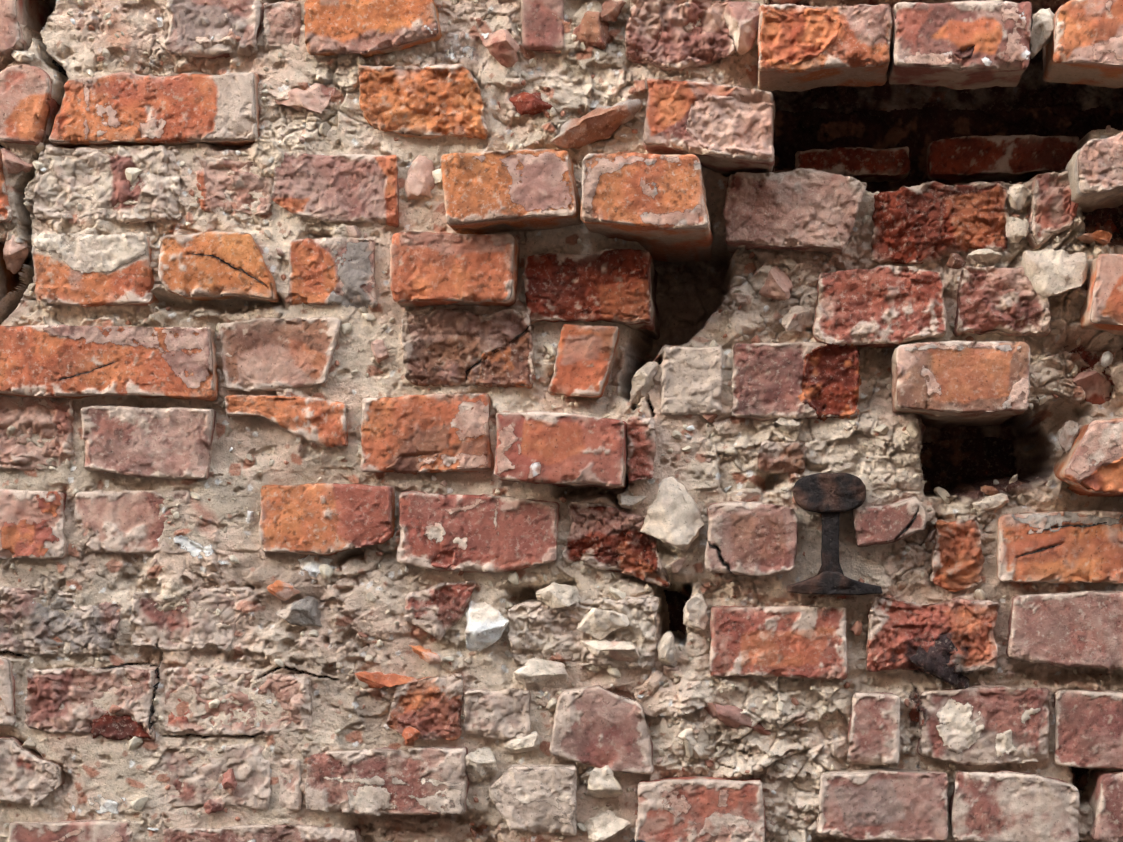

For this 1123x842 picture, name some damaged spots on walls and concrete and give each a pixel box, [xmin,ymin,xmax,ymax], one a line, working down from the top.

crack [52,59,69,79]
spalling [358,64,489,140]
spalling [500,94,1123,352]
crack [56,361,116,381]
peeling [920,366,942,395]
peeling [1002,377,1029,410]
hole [920,437,1031,495]
corrosion [892,632,973,728]